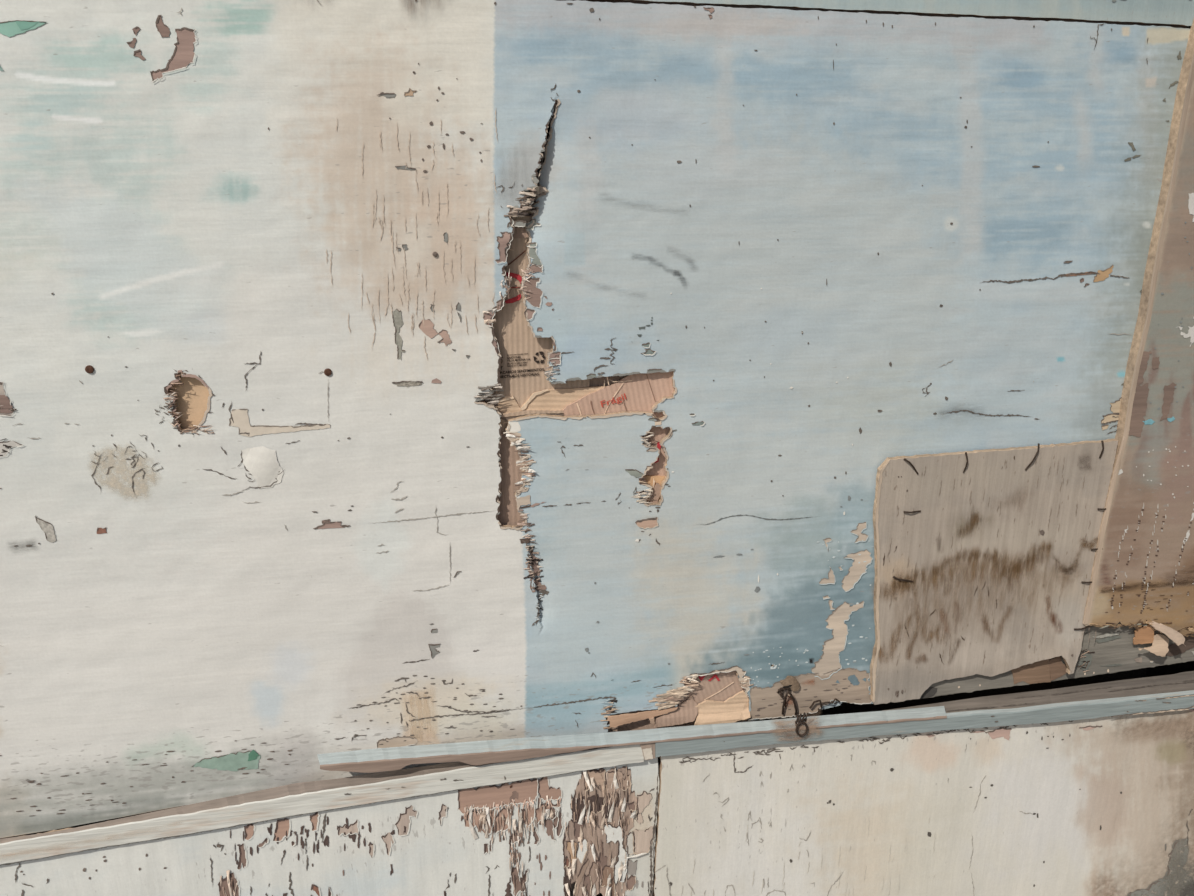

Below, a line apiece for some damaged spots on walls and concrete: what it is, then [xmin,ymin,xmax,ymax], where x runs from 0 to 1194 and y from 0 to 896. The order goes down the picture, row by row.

peeling [126,15,196,82]
crack [980,272,1129,283]
peeling [637,317,659,356]
peeling [1176,317,1194,347]
peeling [506,434,535,484]
peeling [635,507,660,532]
peeling [811,522,873,680]
peeling [583,770,595,792]
peeling [226,805,418,896]
peeling [438,774,636,896]